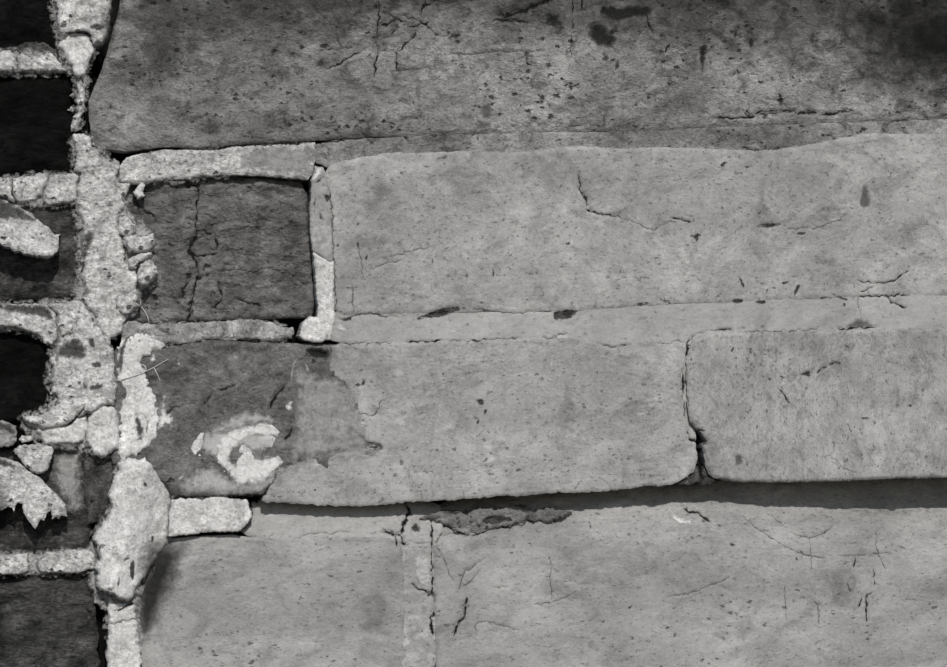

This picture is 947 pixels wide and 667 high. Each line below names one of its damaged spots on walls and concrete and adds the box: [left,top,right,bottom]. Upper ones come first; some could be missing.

crack [320,0,538,76]
peeling [0,197,60,259]
crack [182,184,272,320]
crack [578,175,694,230]
crack [661,271,908,355]
spalling [306,348,328,357]
peeling [285,367,381,460]
crack [687,429,705,478]
peeling [180,477,270,495]
spalling [446,510,512,524]